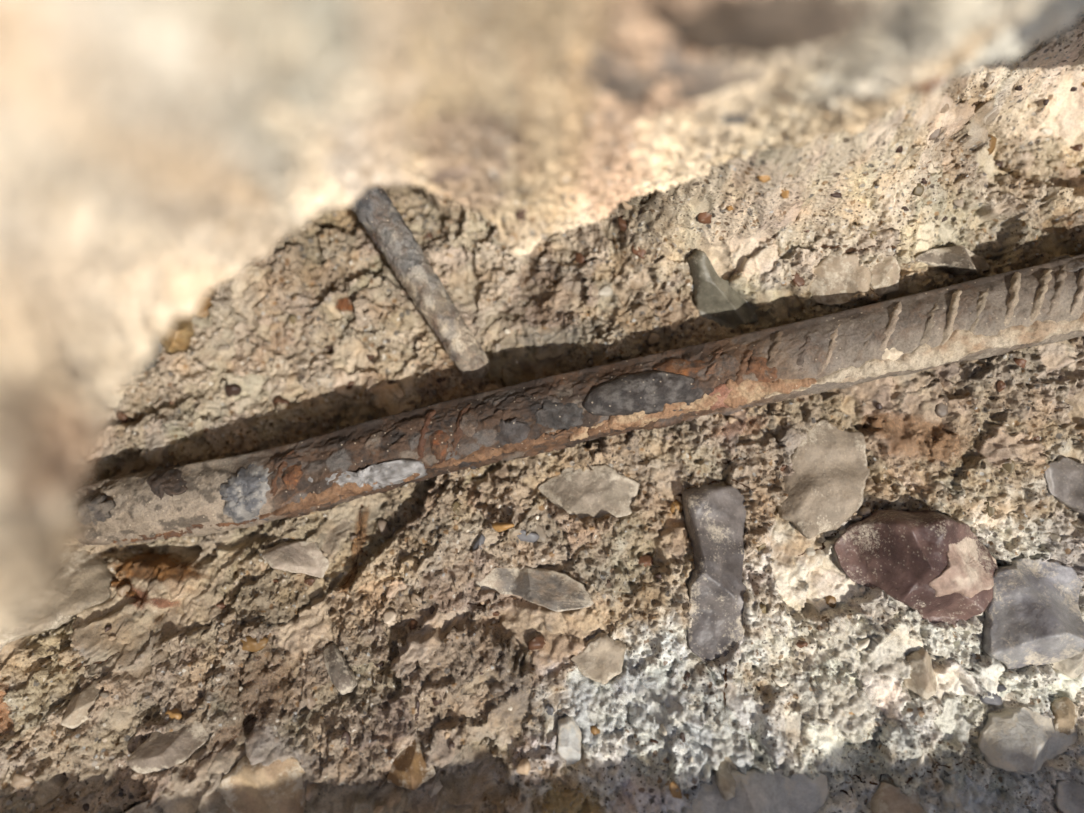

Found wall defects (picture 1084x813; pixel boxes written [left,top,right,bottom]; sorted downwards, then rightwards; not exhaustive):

corrosion [336,297,354,312]
spalling [0,0,1084,638]
corrosion [745,355,778,383]
corrosion [459,413,478,437]
corrosion [494,357,705,456]
corrosion [862,415,960,461]
corrosion [146,461,190,499]
corrosion [75,494,116,526]
corrosion [110,551,206,608]